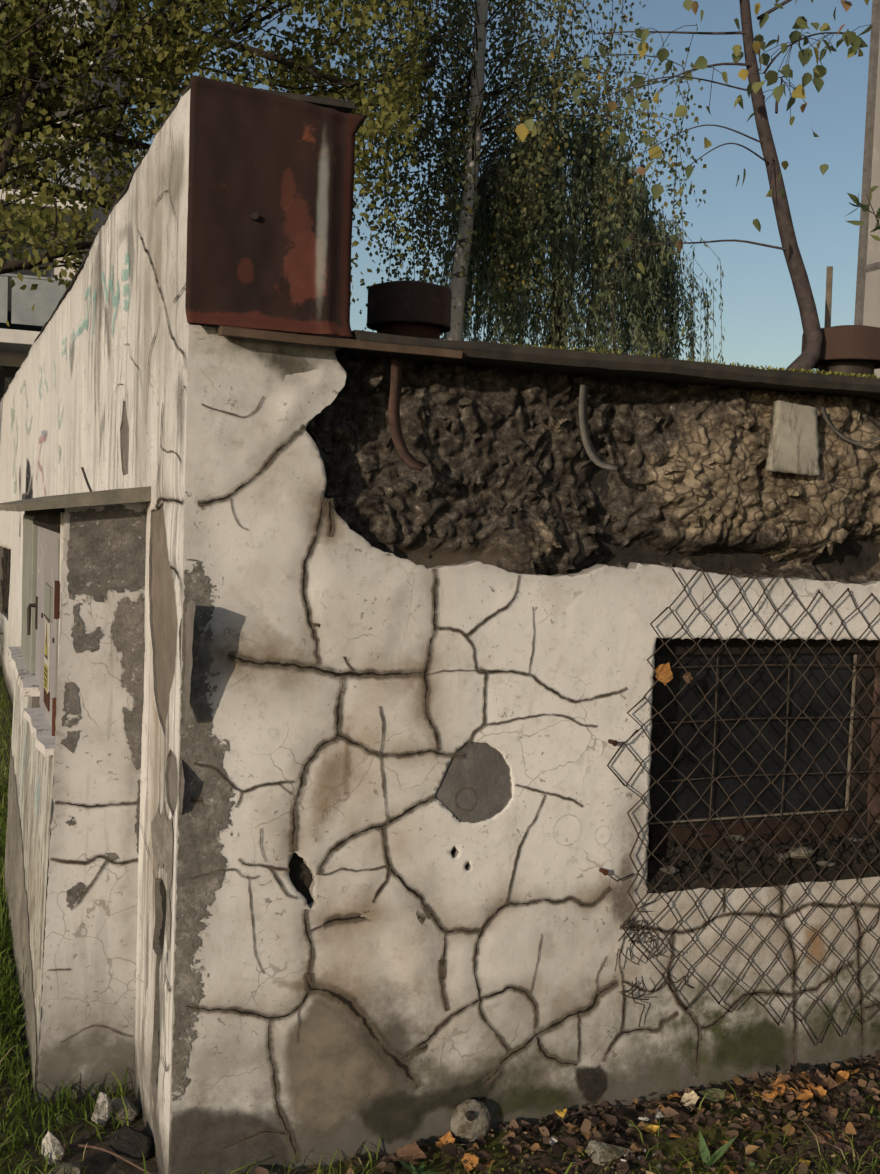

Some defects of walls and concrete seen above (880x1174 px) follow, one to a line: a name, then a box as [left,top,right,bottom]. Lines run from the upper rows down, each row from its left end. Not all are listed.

crack [154,127,176,224]
crack [111,229,306,530]
spalling [305,351,880,584]
peeling [60,682,82,753]
crack [50,801,154,907]
peeling [66,505,235,1101]
spalling [289,852,313,905]
spalling [435,741,511,823]
crack [164,497,880,1163]
leakage [170,1109,287,1174]
leakage [361,1072,502,1143]
leakage [576,1066,607,1104]